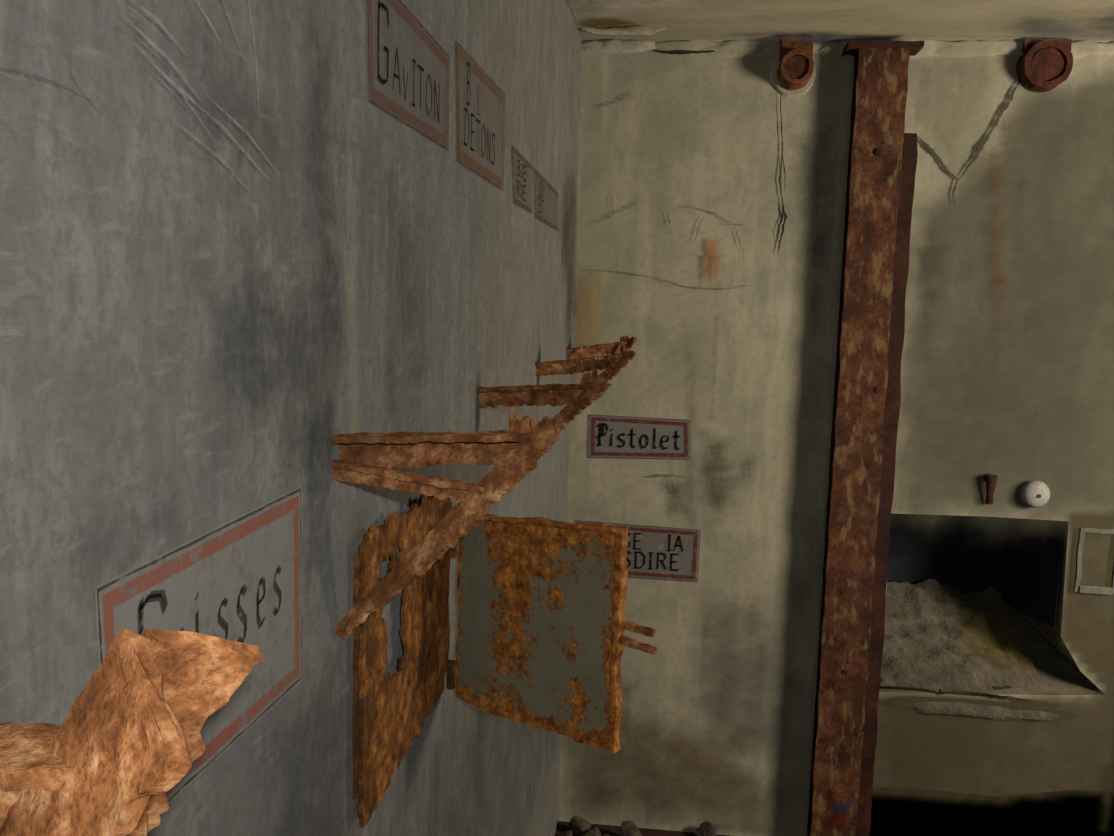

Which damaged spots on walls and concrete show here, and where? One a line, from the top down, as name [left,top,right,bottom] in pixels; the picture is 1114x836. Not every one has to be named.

crack [595,192,748,245]
crack [777,94,788,257]
crack [917,80,1021,204]